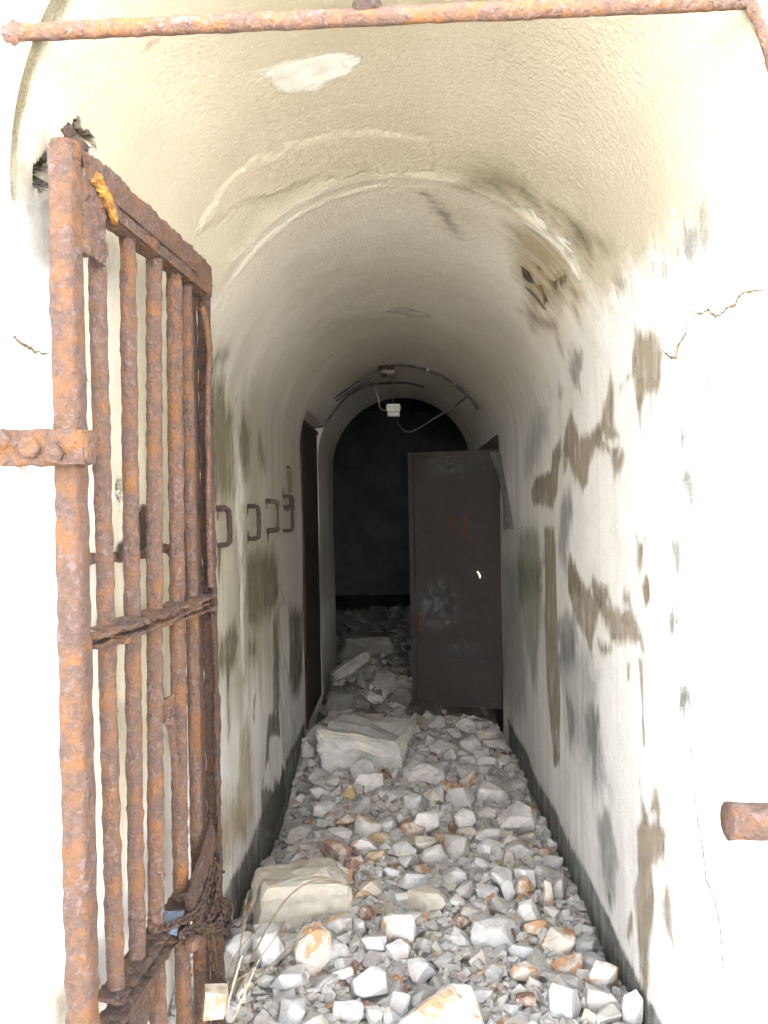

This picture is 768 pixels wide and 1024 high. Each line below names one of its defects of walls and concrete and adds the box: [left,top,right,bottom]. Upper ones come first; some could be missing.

flaking render [260,52,360,92]
hole [73,118,96,148]
hole [32,151,49,192]
peeling [519,209,581,310]
crack [13,336,49,355]
water stain [627,332,678,419]
crack [663,288,767,359]
water stain [519,377,639,765]
water stain [637,539,649,603]
water stain [212,382,305,940]
water stain [508,719,670,1024]